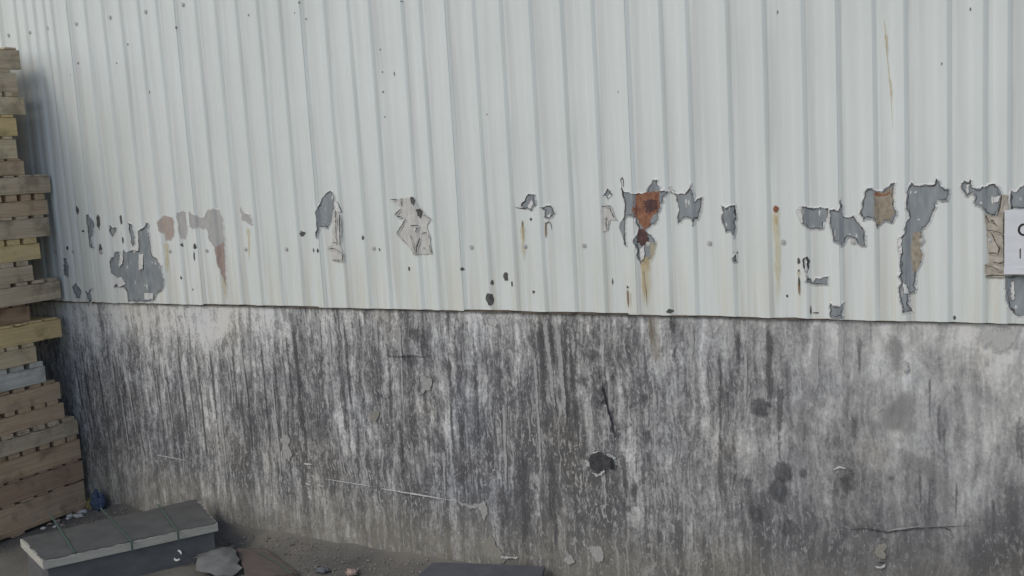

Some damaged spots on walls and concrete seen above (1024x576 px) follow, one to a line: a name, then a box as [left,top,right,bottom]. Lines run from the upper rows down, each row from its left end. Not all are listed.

peeling [76,206,228,303]
peeling [299,190,342,253]
peeling [601,178,704,274]
peeling [720,204,739,264]
peeling [796,176,1024,315]
leakage [152,342,253,483]
leakage [261,325,308,482]
leakage [442,359,465,503]
leakage [499,320,578,547]
flaking render [585,451,617,477]
crack [601,383,615,441]
leakage [717,320,784,449]